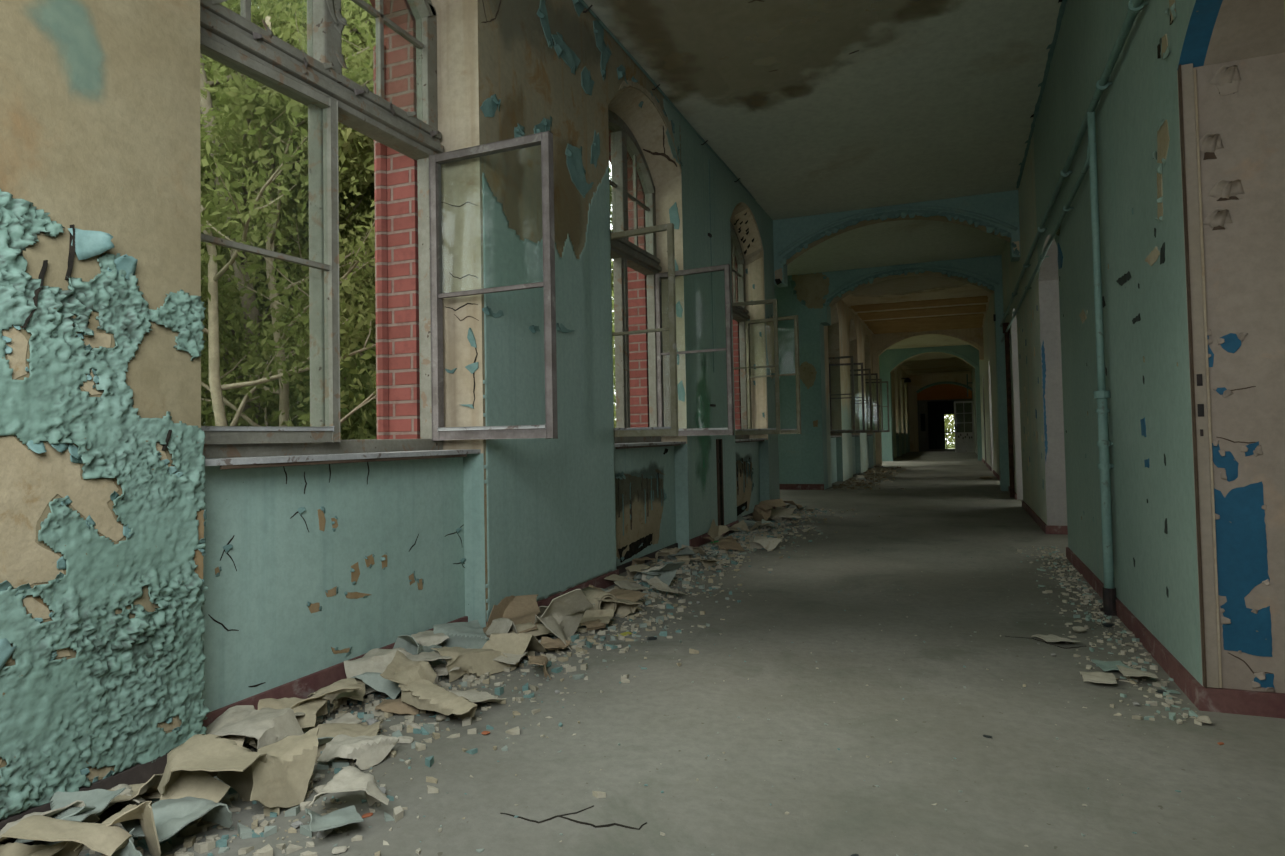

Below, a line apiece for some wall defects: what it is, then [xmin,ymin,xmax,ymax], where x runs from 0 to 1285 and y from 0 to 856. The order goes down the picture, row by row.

peeling [1199,131,1224,160]
peeling [1145,119,1170,266]
peeling [1203,179,1244,230]
crack [21,224,75,328]
peeling [1117,271,1139,289]
peeling [1207,329,1248,367]
peeling [444,165,667,622]
peeling [0,189,222,820]
peeling [318,507,338,531]
peeling [307,553,388,613]
peeling [1212,440,1275,692]
crack [500,805,647,830]